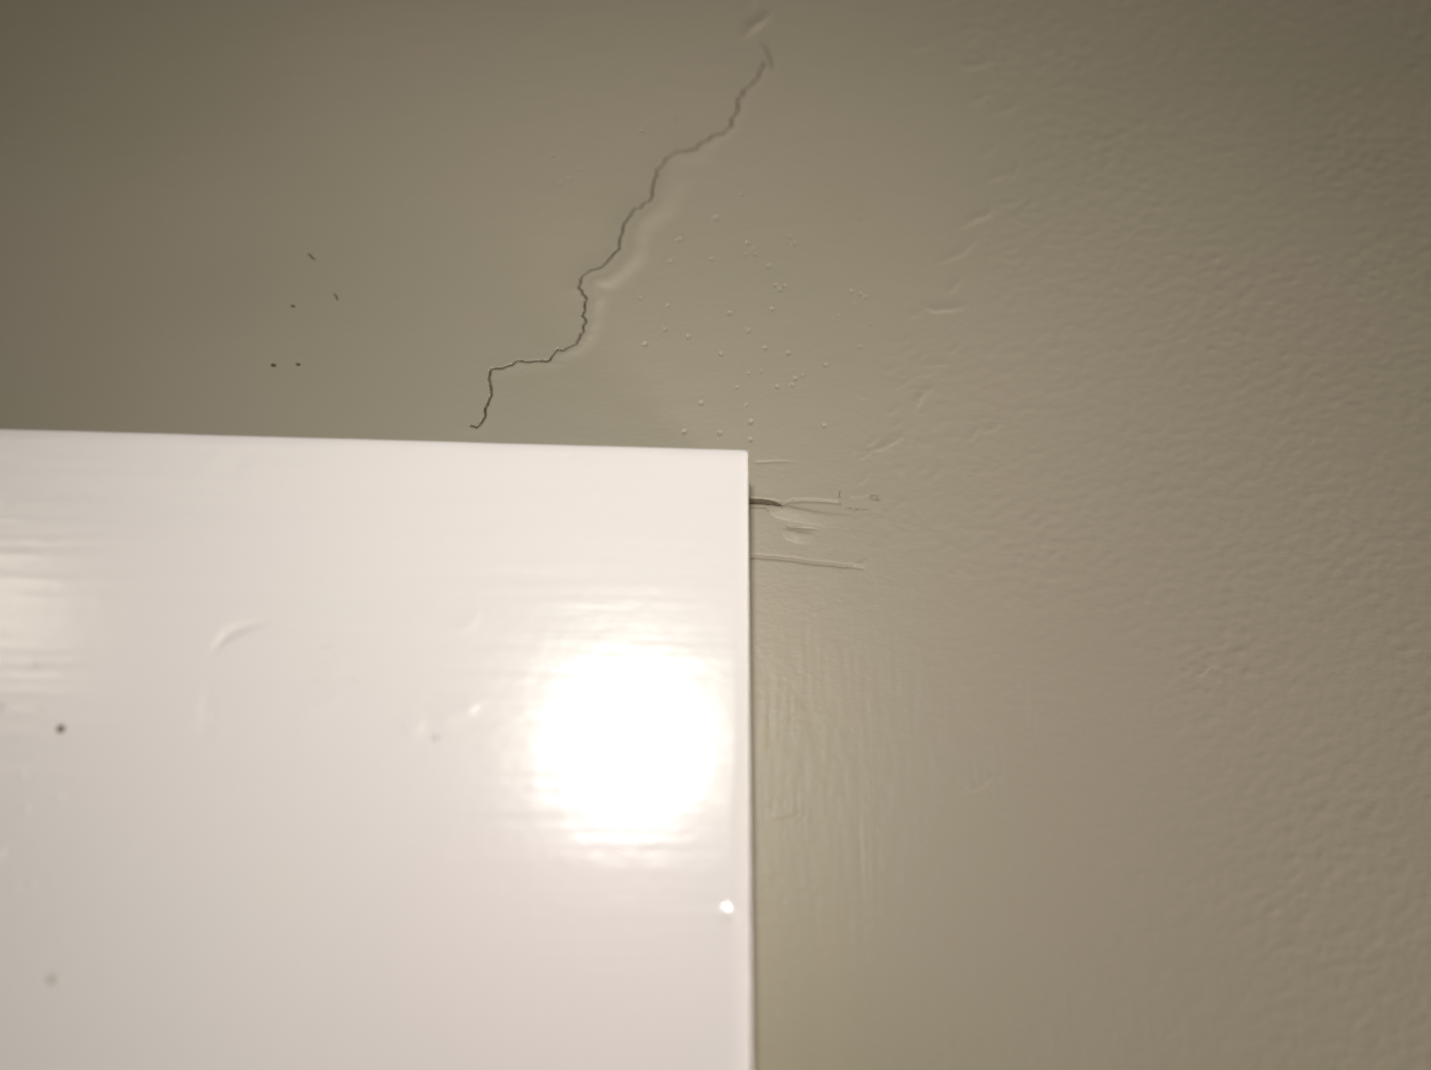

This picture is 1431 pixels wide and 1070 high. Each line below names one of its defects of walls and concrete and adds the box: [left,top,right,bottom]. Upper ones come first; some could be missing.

crack [445,0,802,443]
crack [748,452,887,579]